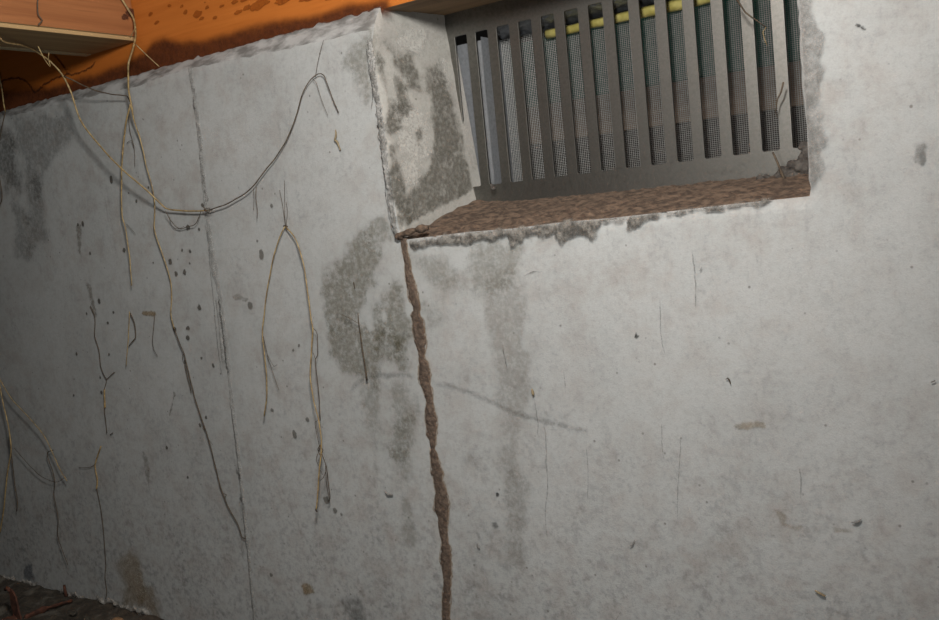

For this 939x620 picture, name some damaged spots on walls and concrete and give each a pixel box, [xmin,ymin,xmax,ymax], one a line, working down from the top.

leakage [0,0,388,112]
leakage [387,29,471,222]